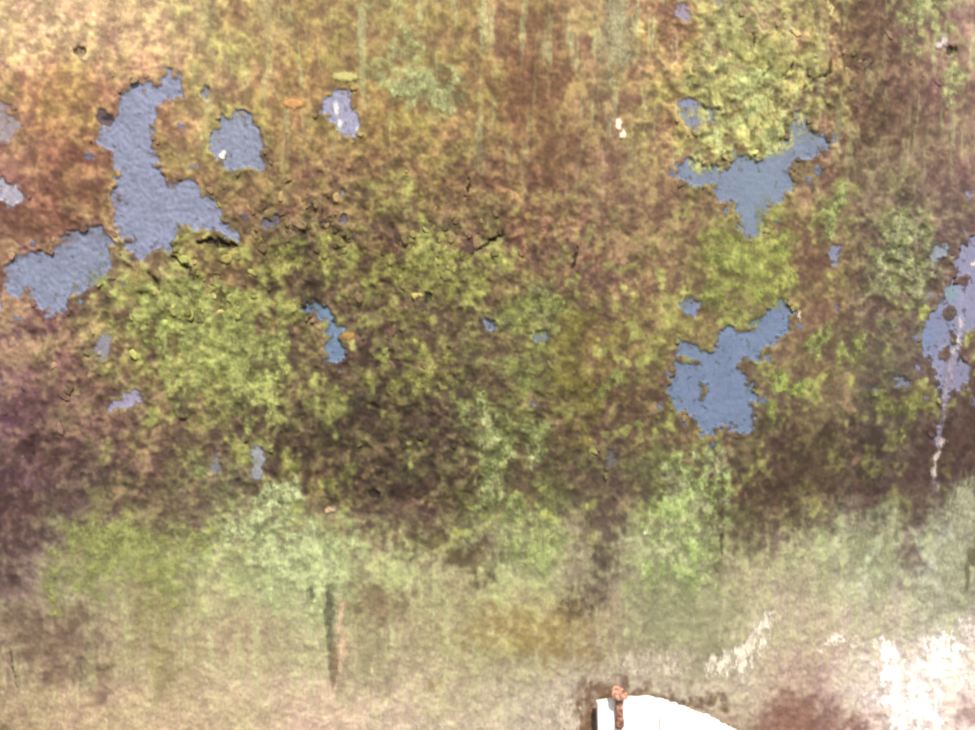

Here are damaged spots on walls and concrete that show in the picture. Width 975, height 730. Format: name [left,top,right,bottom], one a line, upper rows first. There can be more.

peeling [0,68,364,343]
peeling [380,200,524,282]
peeling [669,110,836,240]
peeling [288,294,365,372]
peeling [657,297,803,449]
peeling [913,230,975,406]
mould [398,522,493,584]
water stain [590,470,625,572]
water stain [862,318,975,730]
efflorescence [818,631,858,652]